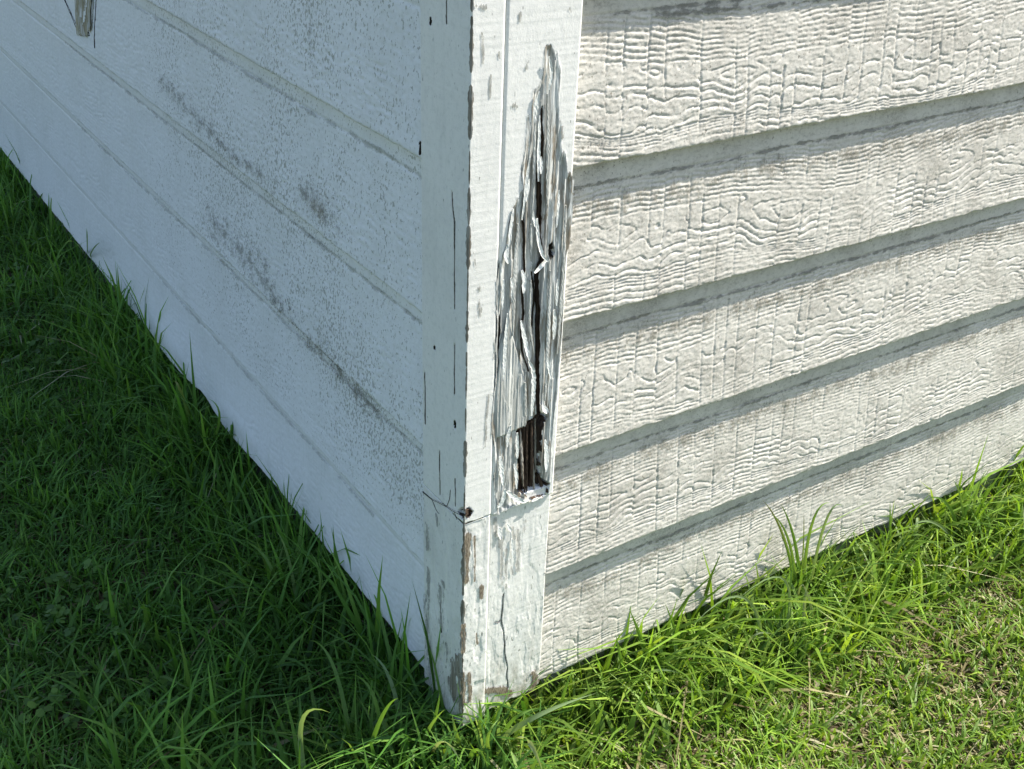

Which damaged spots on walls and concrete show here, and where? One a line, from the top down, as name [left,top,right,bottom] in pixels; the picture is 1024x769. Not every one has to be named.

spalling [459,0,492,729]
peeling [483,45,574,589]
crack [495,594,508,687]